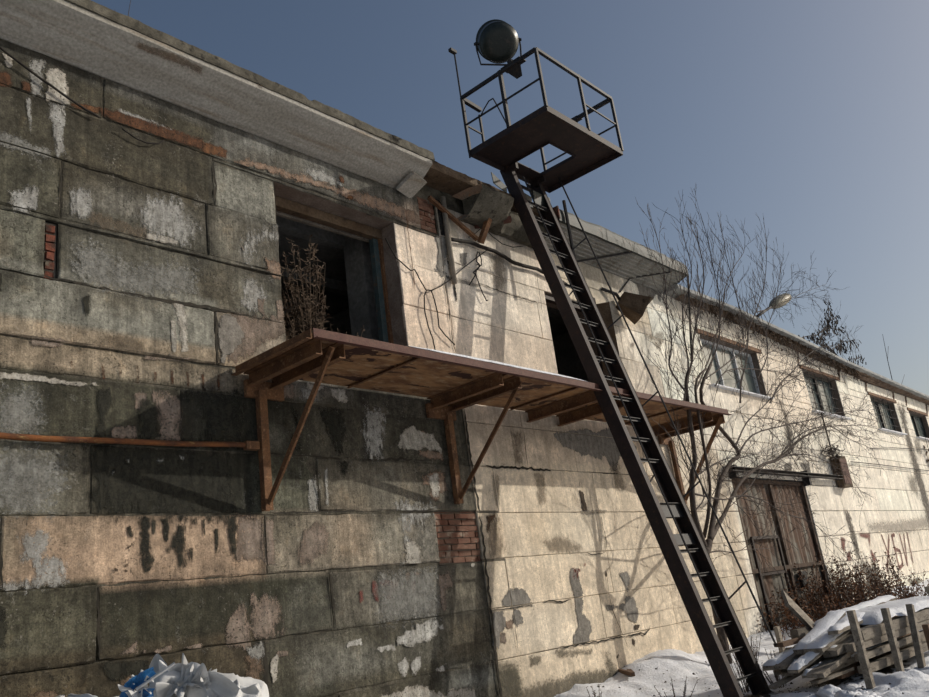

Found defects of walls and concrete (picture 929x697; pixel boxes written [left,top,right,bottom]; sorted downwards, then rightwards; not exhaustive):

rust [71,103,227,158]
peeling [234,157,420,224]
peeling [398,425,448,502]
leakage [151,516,193,569]
leakage [202,516,238,559]
crack [464,409,571,697]
peeling [120,641,172,654]
peeling [226,593,288,683]
peeling [377,619,476,697]
crack [560,578,650,648]